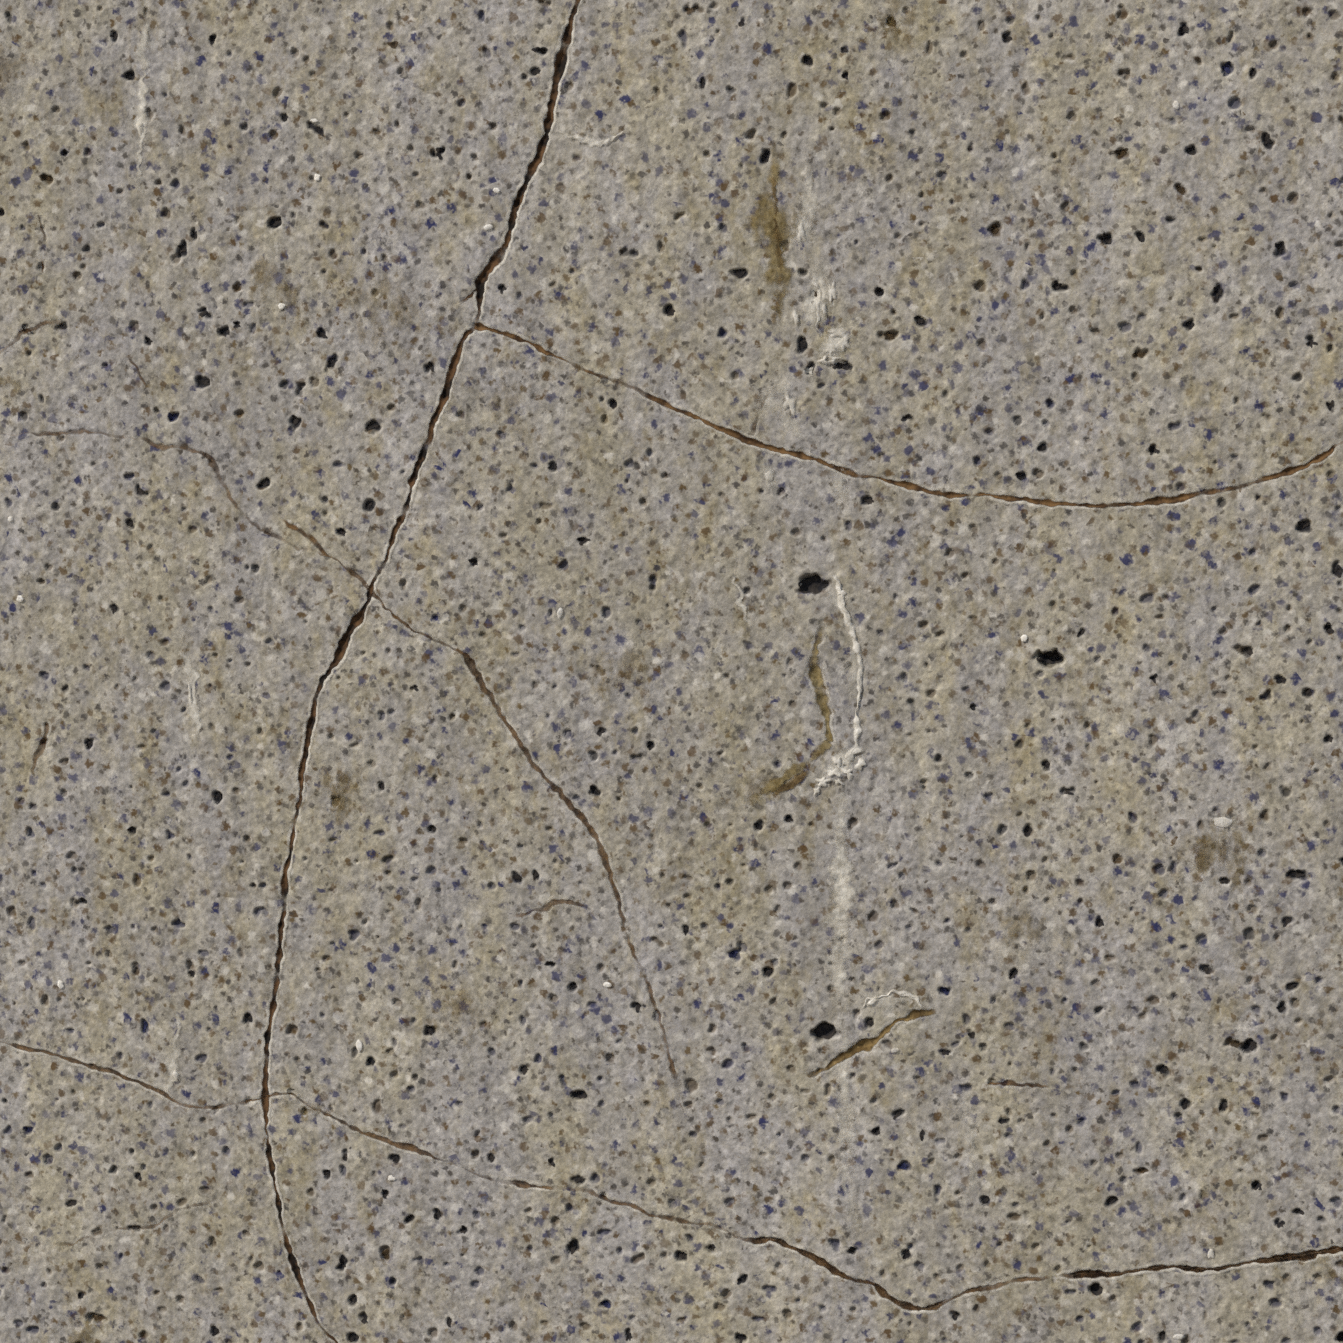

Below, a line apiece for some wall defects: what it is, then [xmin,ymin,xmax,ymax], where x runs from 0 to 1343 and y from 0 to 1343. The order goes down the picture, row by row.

crack [631,386,1343,509]
crack [10,0,690,1343]
crack [763,632,833,794]
damp [814,576,866,991]
damp [838,1022,848,1141]
crack [807,1009,935,1077]
crack [989,1080,1046,1088]
crack [744,1235,1343,1314]